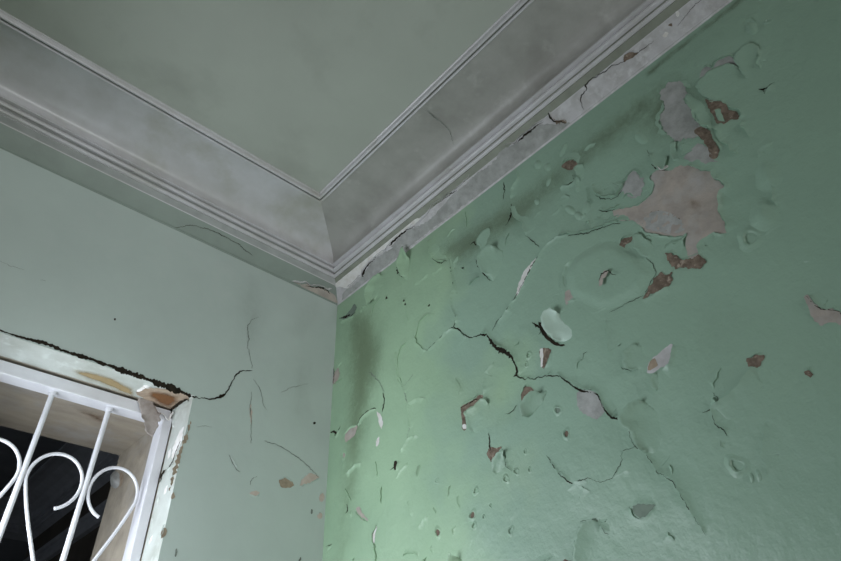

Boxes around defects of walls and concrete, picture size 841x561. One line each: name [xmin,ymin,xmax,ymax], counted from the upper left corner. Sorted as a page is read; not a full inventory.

flaking render [293,118,570,303]
flaking render [558,43,768,308]
crack [0,318,318,477]
flaking render [136,385,191,506]
flaking render [461,389,516,474]
peeling [508,381,547,417]
peeling [532,307,572,369]
crack [427,234,712,533]
flaking render [746,350,765,368]
flaking render [804,292,841,326]
peeling [563,516,611,561]
peeling [624,494,657,527]